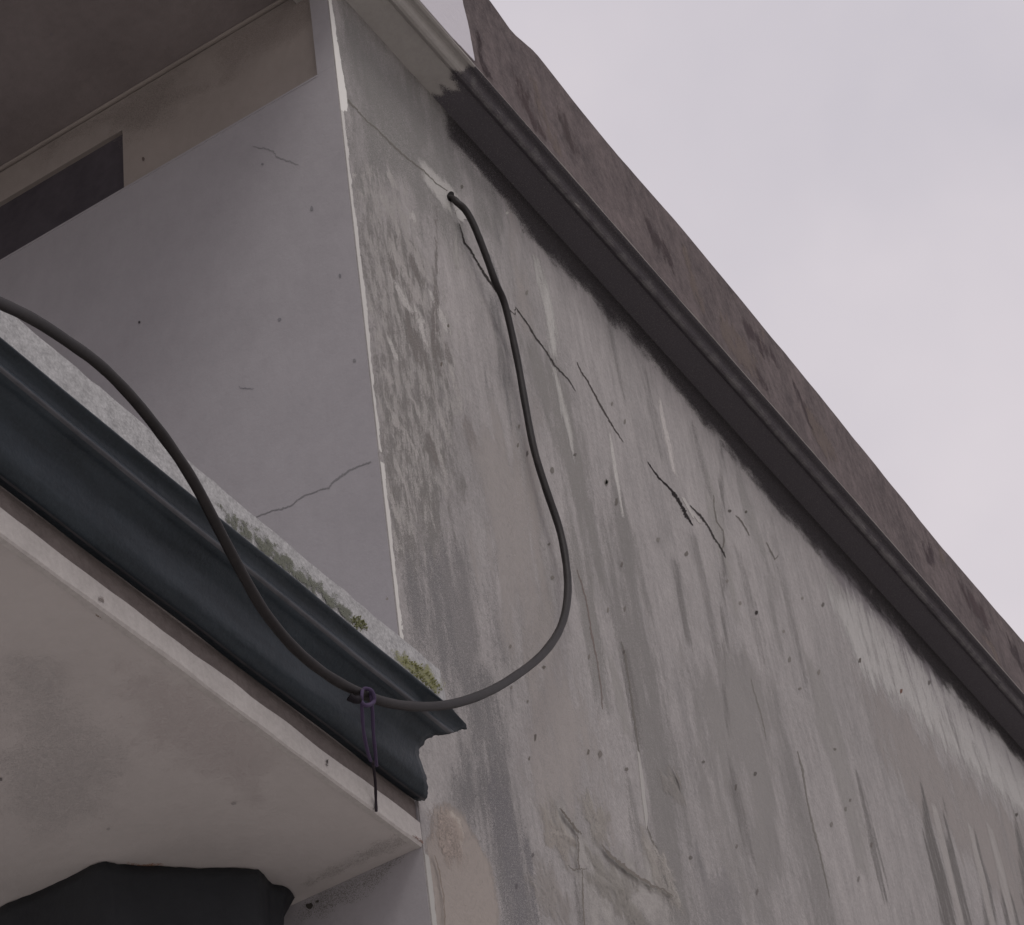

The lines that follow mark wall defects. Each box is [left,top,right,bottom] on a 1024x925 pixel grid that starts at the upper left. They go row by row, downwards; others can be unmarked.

crack [347,99,448,191]
crack [459,224,623,441]
crack [256,461,371,517]
leakage [333,0,1024,925]
crack [648,462,778,560]